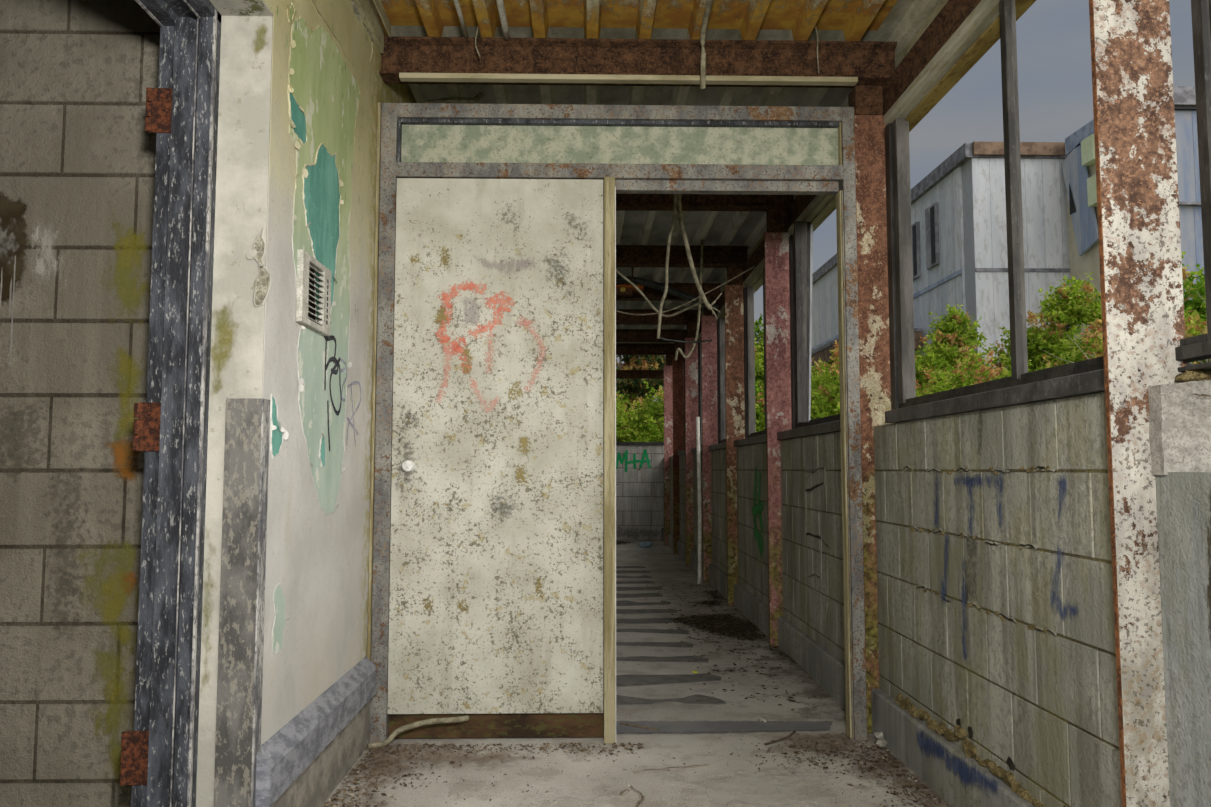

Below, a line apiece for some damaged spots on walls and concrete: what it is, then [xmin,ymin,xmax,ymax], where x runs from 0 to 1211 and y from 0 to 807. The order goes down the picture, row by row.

peeling [247,227,272,307]
peeling [270,2,373,516]
crack [1190,391,1211,399]
crack [618,764,709,807]